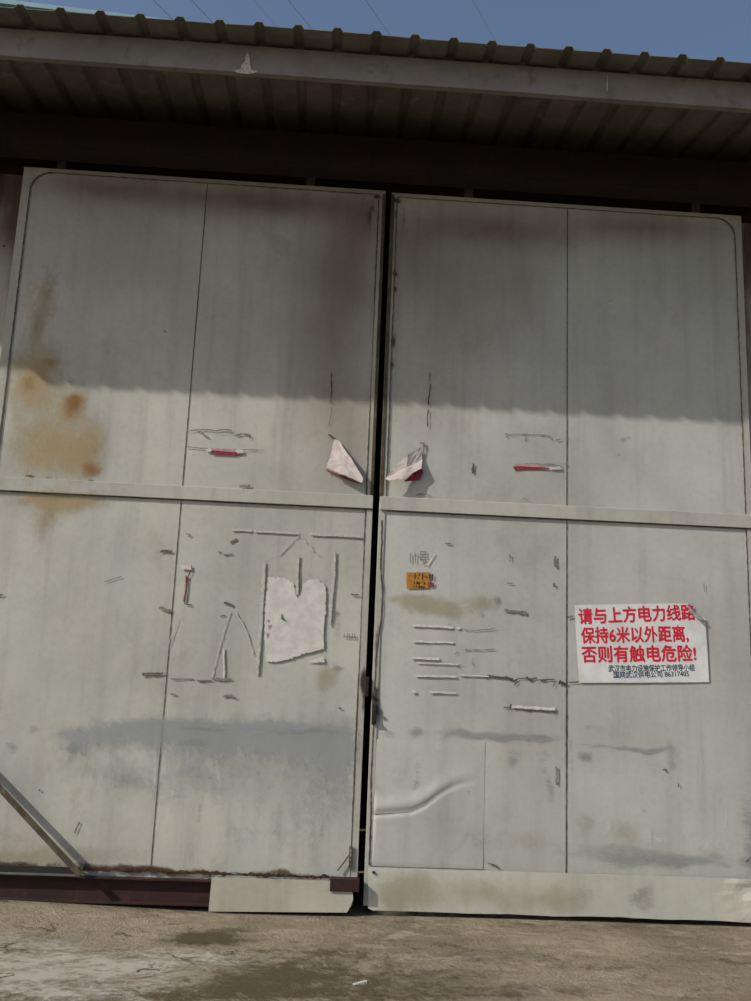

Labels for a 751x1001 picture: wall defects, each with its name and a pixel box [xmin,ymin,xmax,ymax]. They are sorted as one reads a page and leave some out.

corrosion [77,863,330,879]